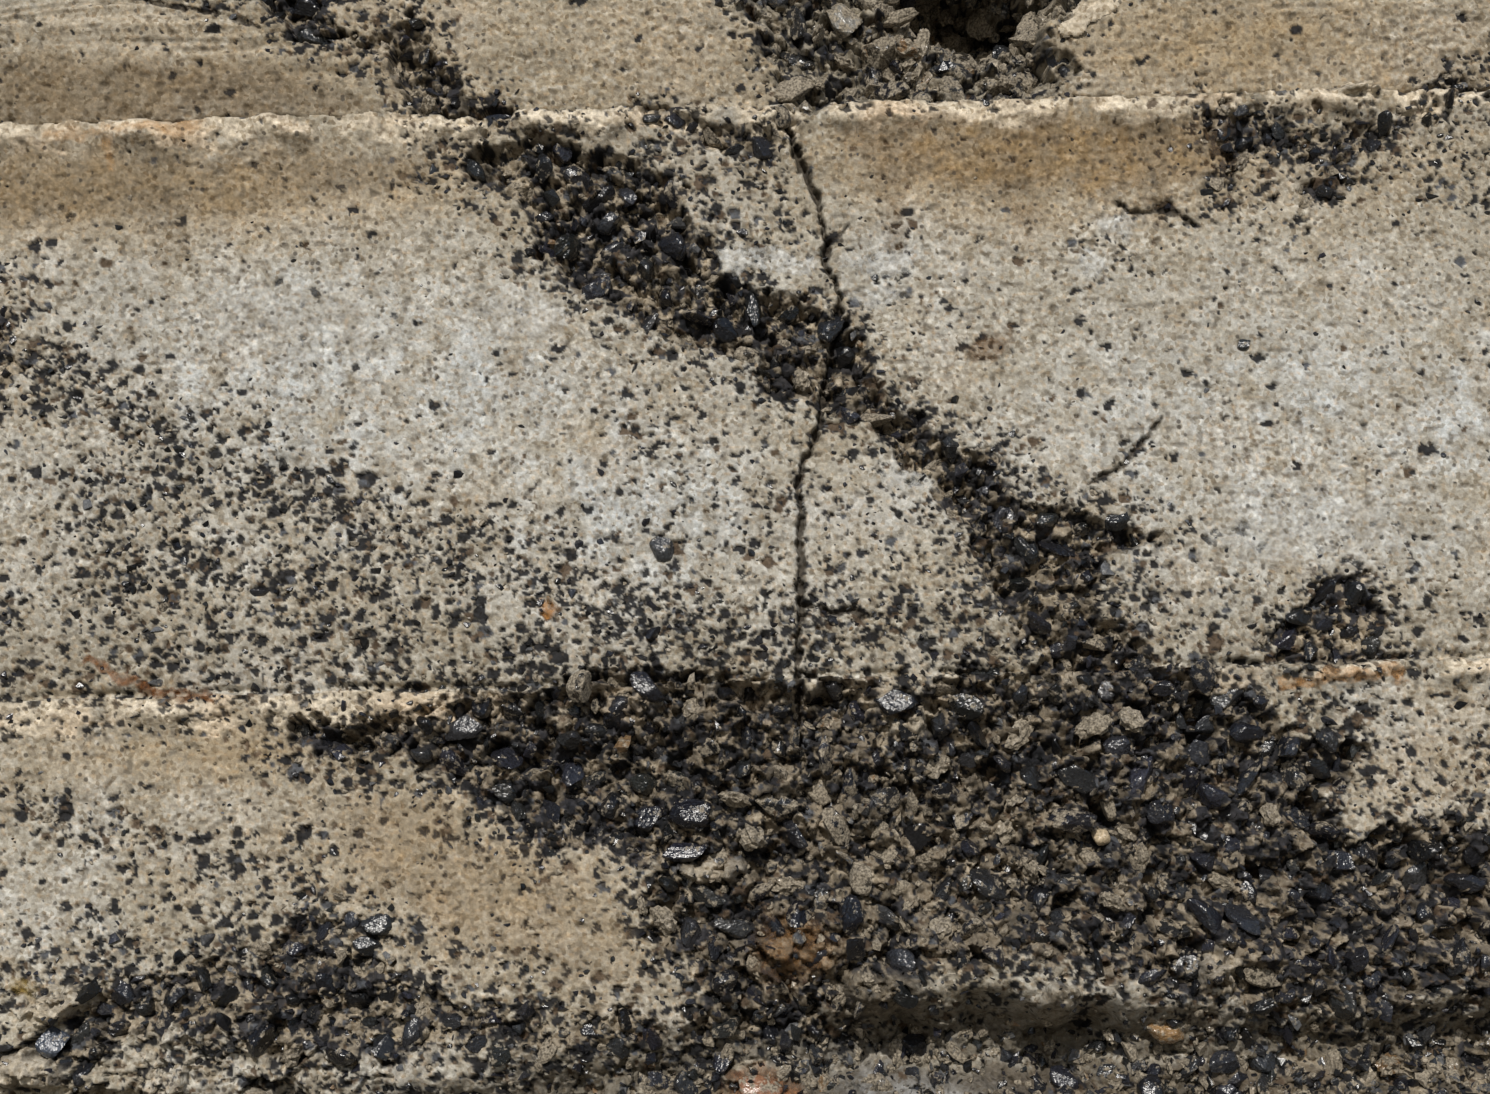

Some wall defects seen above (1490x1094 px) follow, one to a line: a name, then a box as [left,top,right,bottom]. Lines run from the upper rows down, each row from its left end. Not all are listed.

spalling [261,0,520,146]
spalling [637,0,1121,169]
spalling [0,305,52,390]
crack [784,128,874,750]
spalling [288,126,1490,1094]
spalling [41,907,741,1094]